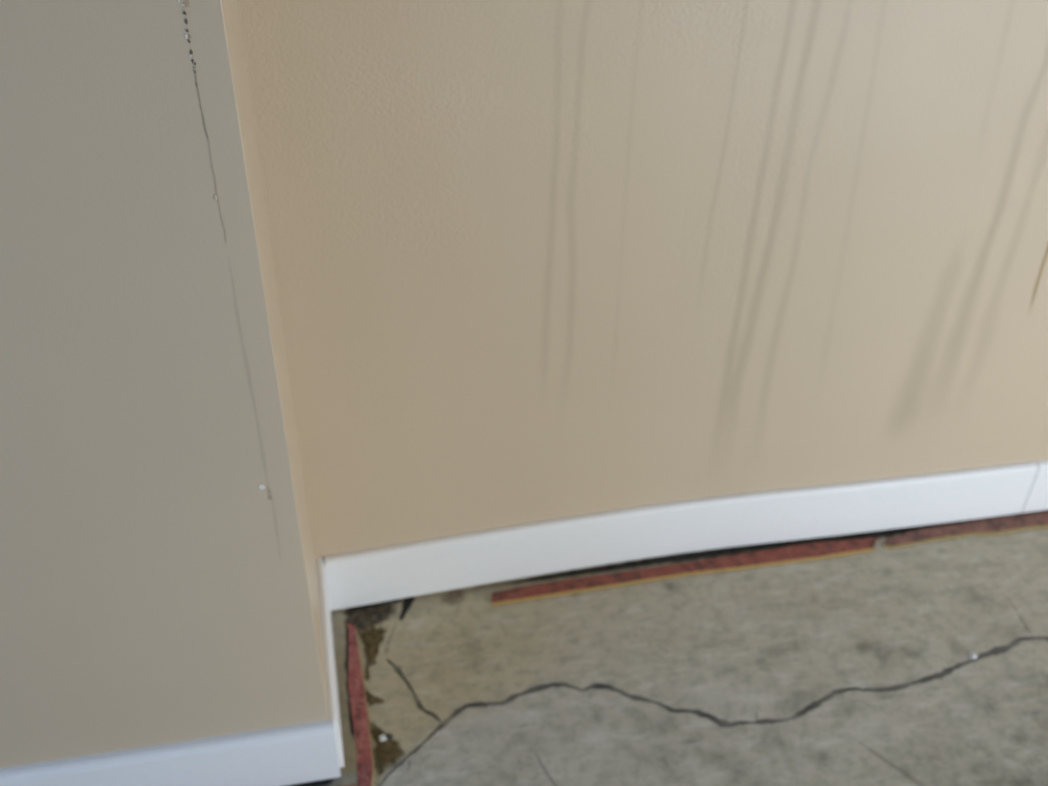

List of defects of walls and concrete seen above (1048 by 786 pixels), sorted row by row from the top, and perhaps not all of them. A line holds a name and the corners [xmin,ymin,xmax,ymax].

crack [177,0,196,65]
crack [399,597,415,621]
spalling [359,626,386,706]
crack [378,637,1048,786]
spalling [372,724,403,776]